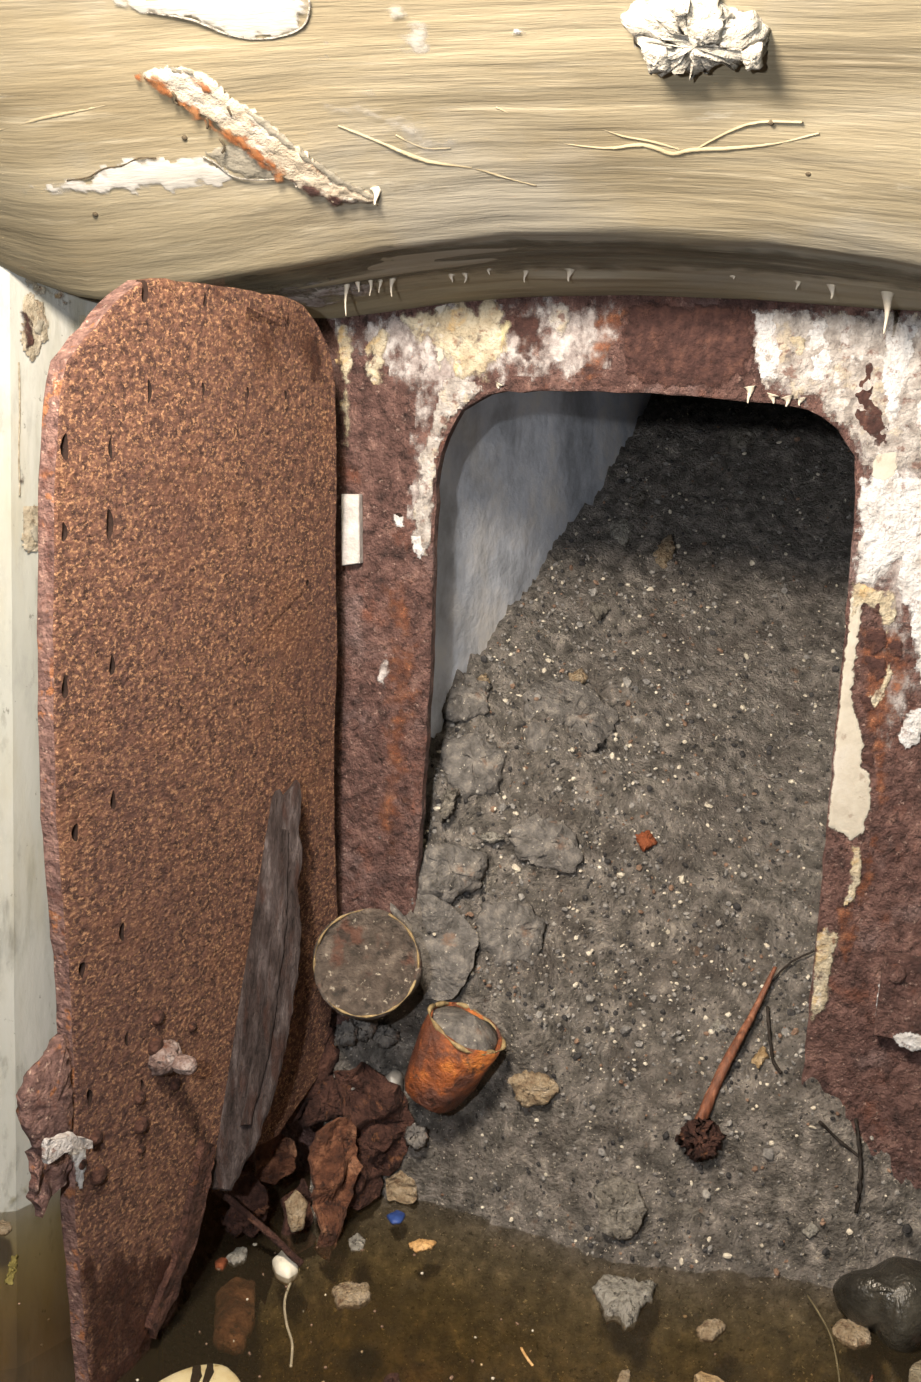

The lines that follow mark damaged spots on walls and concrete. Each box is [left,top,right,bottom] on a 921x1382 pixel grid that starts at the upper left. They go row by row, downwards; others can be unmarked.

spalling [46,65,379,206]
damp [212,242,921,307]
corrosion [513,314,543,361]
corrosion [590,303,755,388]
damp [304,299,618,559]
corrosion [855,363,888,446]
damp [752,308,921,906]
damp [377,660,390,684]
corrosion [859,630,906,790]
damp [811,929,838,1020]
corrosion [24,1147,73,1218]